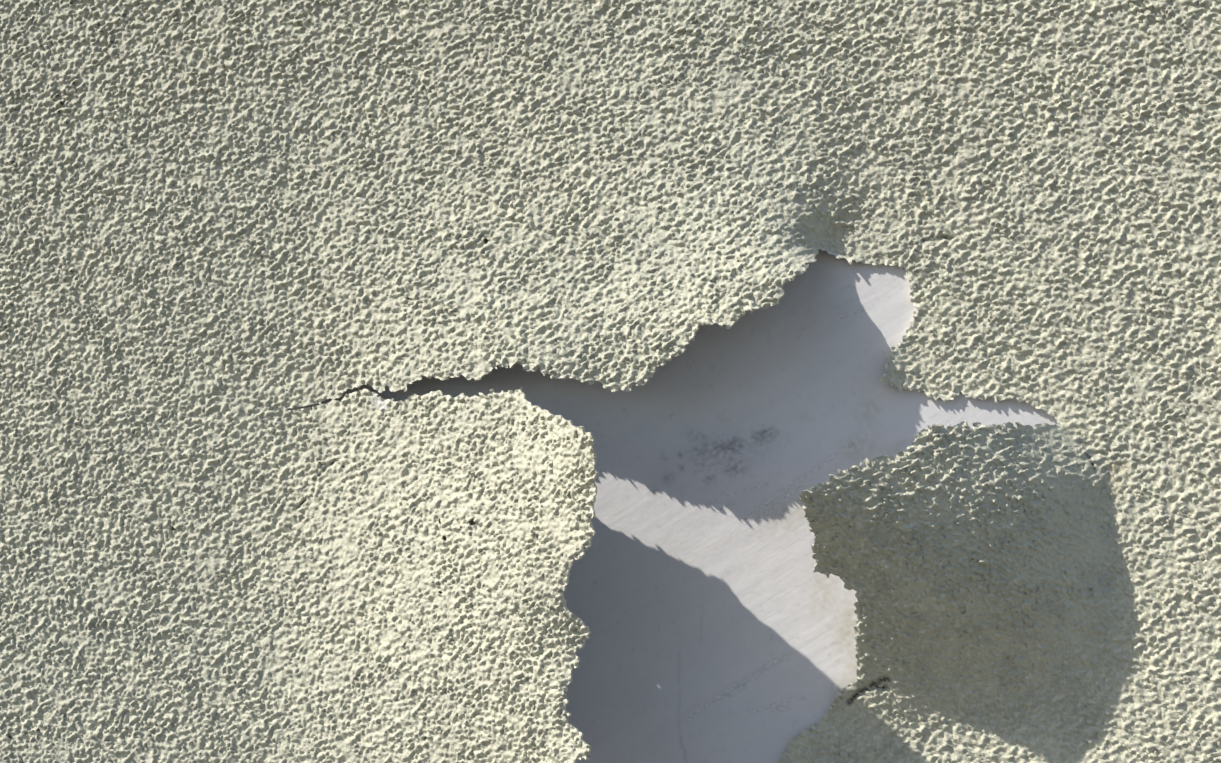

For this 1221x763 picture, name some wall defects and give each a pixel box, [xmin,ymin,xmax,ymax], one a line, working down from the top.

crack [288,363,632,501]
flaking render [272,22,1110,763]